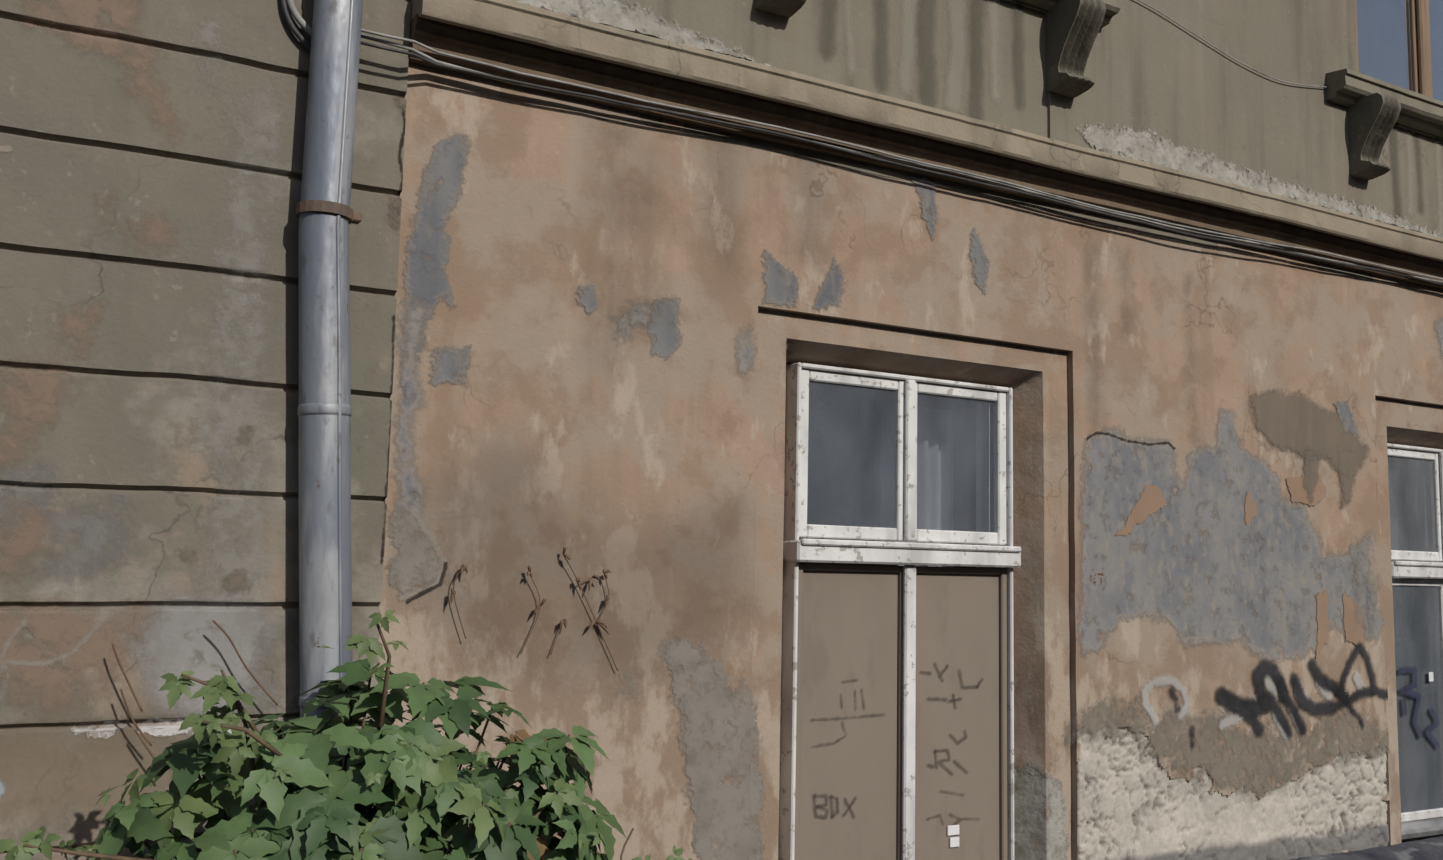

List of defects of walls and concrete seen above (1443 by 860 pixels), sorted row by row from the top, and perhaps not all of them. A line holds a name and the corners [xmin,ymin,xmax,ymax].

flaking render [510,0,770,66]
peeling [381,90,472,603]
peeling [614,297,682,360]
peeling [762,249,845,310]
peeling [907,173,938,240]
peeling [969,228,990,294]
flaking render [1077,123,1443,238]
peeling [0,366,119,574]
peeling [1078,409,1384,662]
peeling [0,571,269,739]
spalling [1014,722,1389,860]